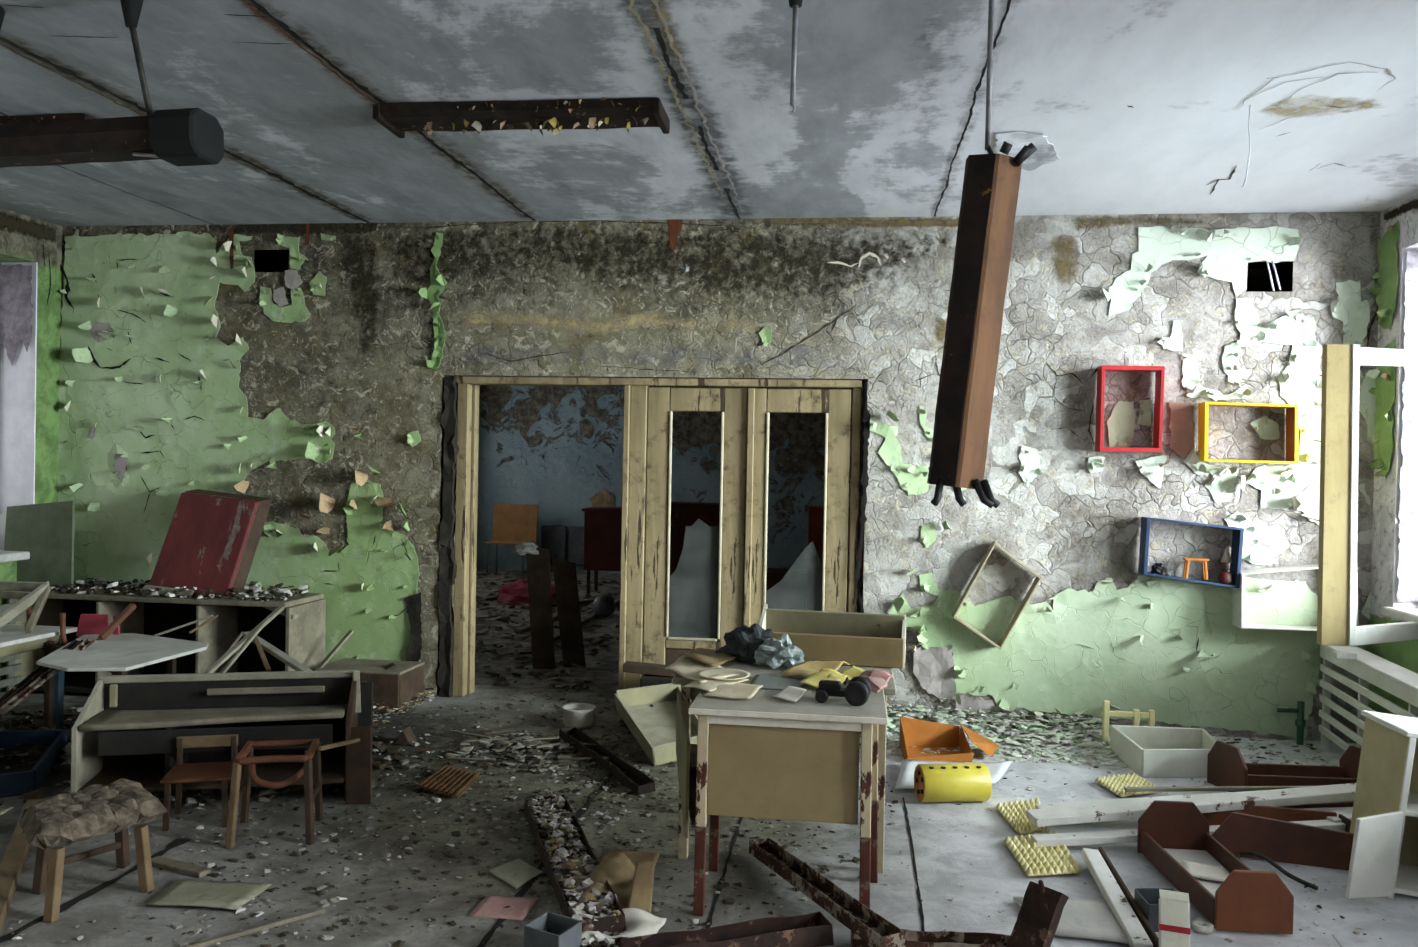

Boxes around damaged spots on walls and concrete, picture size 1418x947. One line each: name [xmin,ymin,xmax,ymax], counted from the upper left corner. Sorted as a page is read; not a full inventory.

damp [1238,62,1396,128]
crack [43,245,204,513]
peeling [58,231,362,587]
damp [234,223,384,354]
peeling [237,232,459,698]
damp [396,217,959,304]
crack [756,305,856,367]
crack [853,382,871,613]
crack [1046,359,1102,447]
peeling [887,225,1322,739]
flaking render [1359,366,1418,602]
damp [1371,199,1418,241]